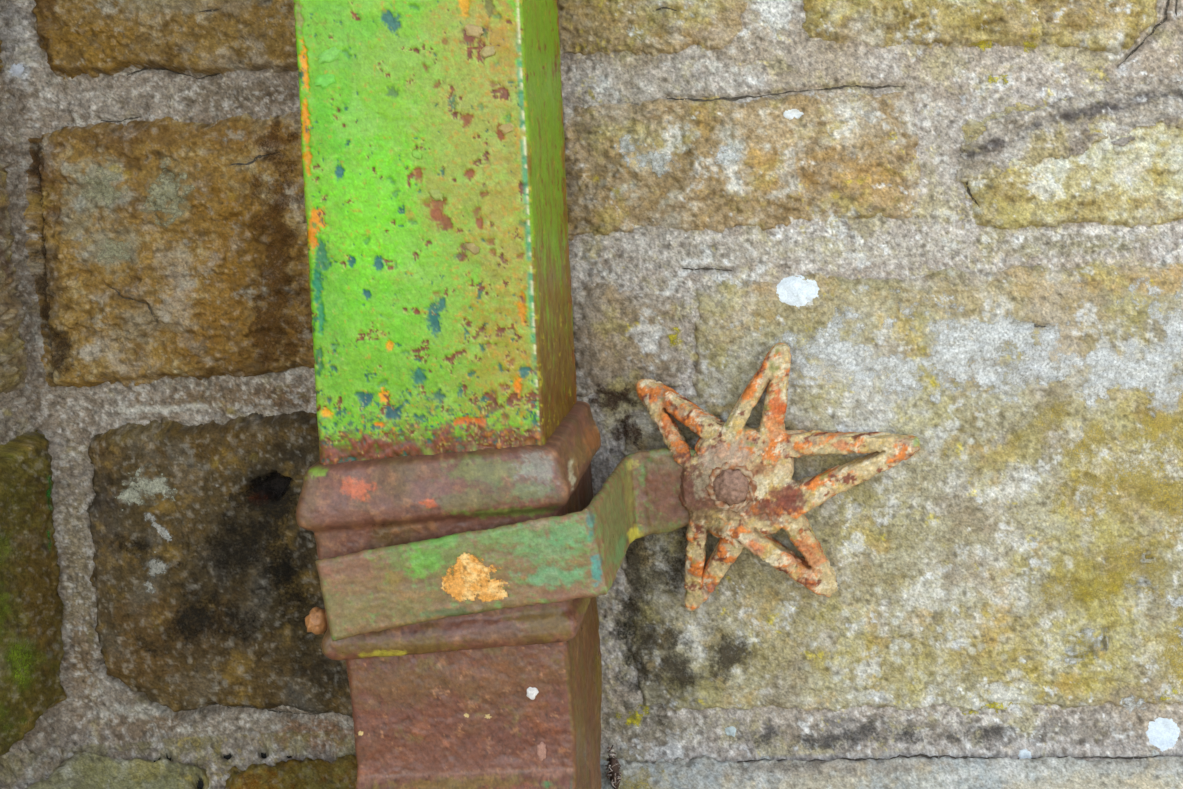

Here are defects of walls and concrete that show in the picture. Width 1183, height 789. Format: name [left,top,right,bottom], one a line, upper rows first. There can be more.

peeling [464,24,495,58]
crack [1118,0,1178,67]
leakage [206,487,314,617]
leakage [165,584,262,645]